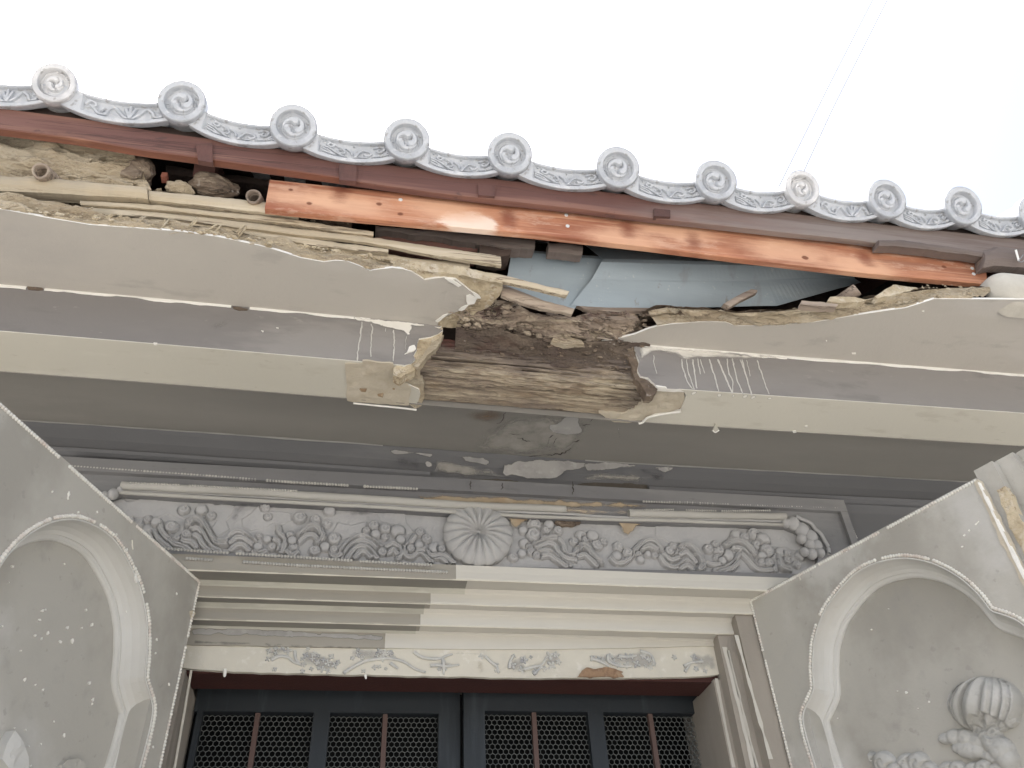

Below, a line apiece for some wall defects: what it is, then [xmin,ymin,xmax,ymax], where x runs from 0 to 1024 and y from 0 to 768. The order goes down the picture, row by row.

flaking render [0,136,169,193]
flaking render [0,192,991,437]
peeling [391,450,648,489]
flaking render [974,479,1024,586]
flaking render [578,667,624,679]